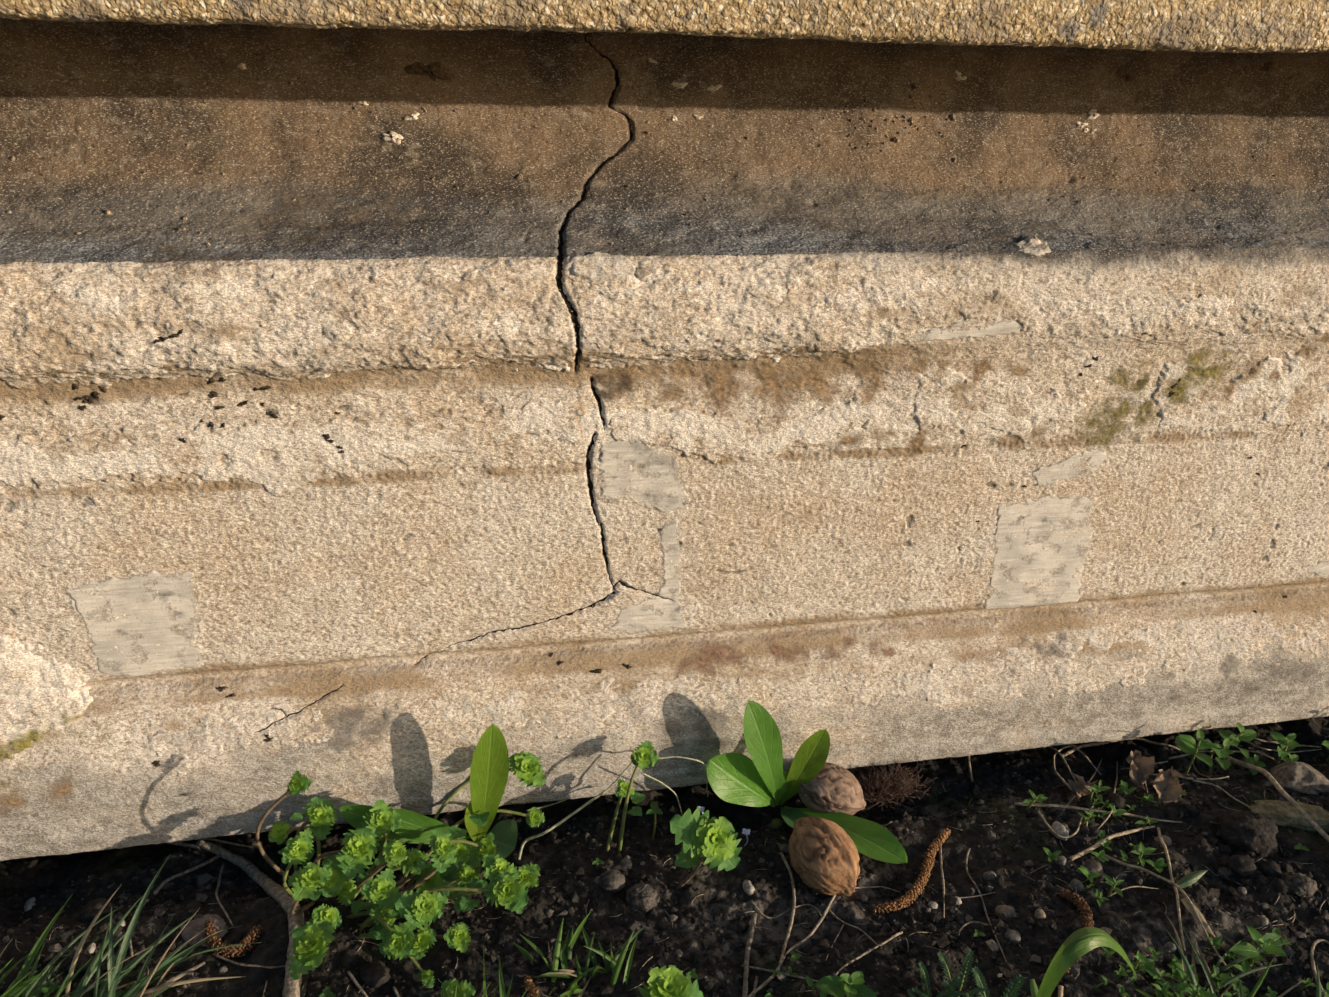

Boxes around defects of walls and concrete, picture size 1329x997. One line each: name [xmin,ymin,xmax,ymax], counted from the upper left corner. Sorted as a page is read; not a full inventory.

crack [414,32,672,665]
leakage [1299,335,1329,356]
leakage [1023,633,1066,657]